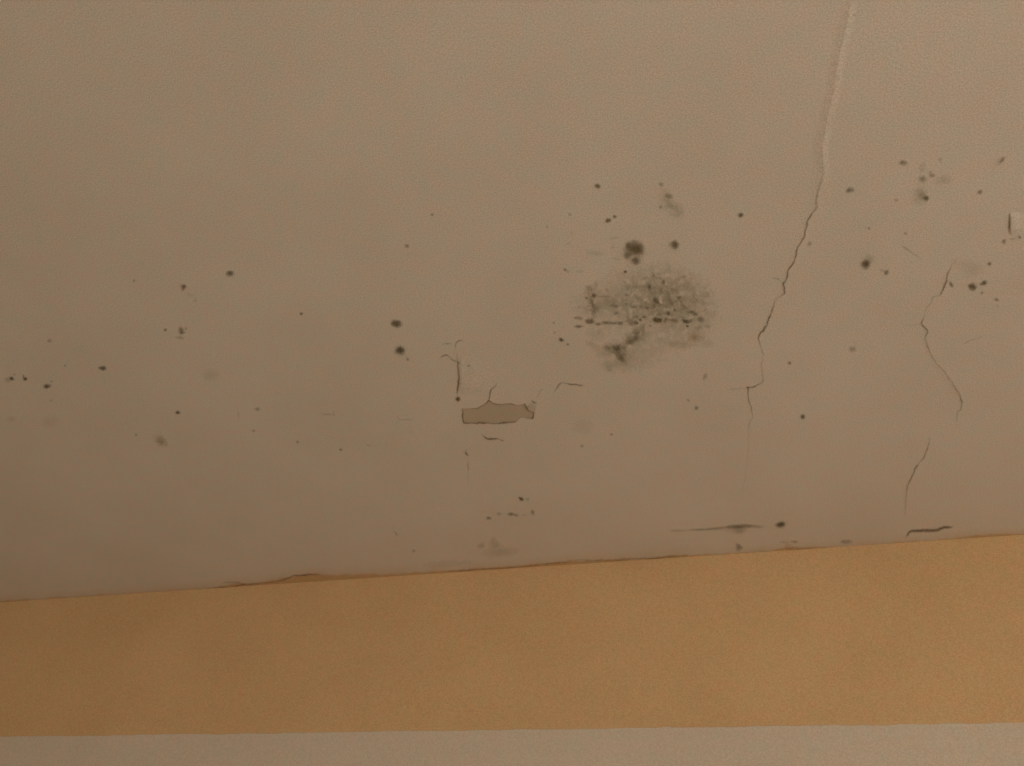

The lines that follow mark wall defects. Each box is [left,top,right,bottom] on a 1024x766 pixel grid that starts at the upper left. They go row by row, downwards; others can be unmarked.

water stain [568,236,723,375]
peeling [461,391,536,424]